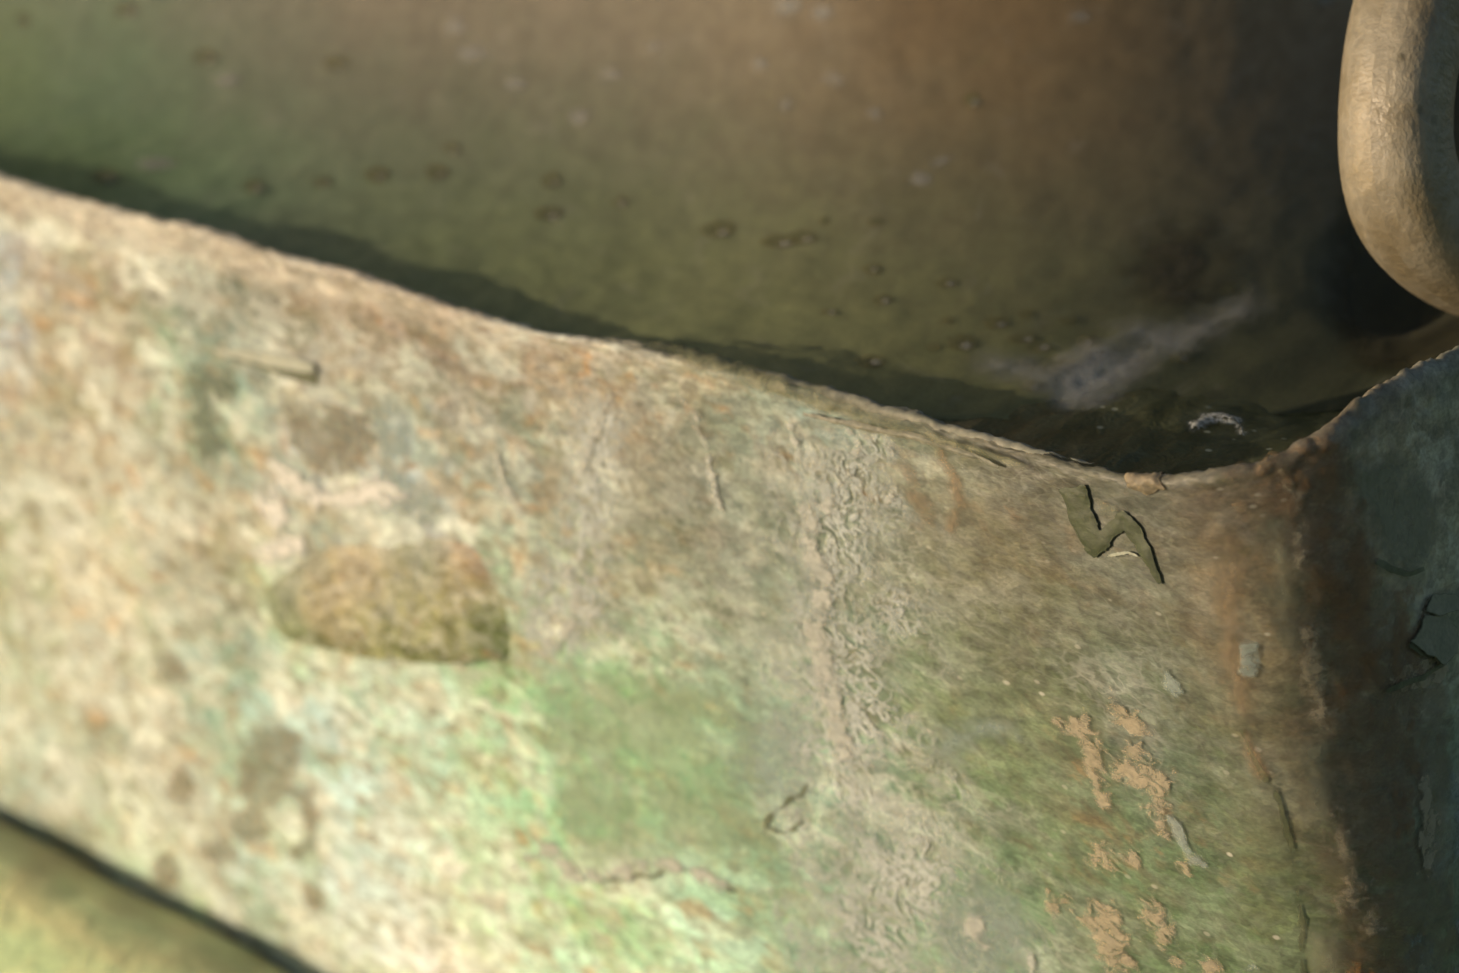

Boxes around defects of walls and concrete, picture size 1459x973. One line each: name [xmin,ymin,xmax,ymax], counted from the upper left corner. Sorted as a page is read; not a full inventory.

peeling [1164,673,1181,695]
peeling [1386,593,1459,693]
peeling [1051,688,1206,878]
peeling [1044,889,1137,973]
peeling [1140,899,1223,973]